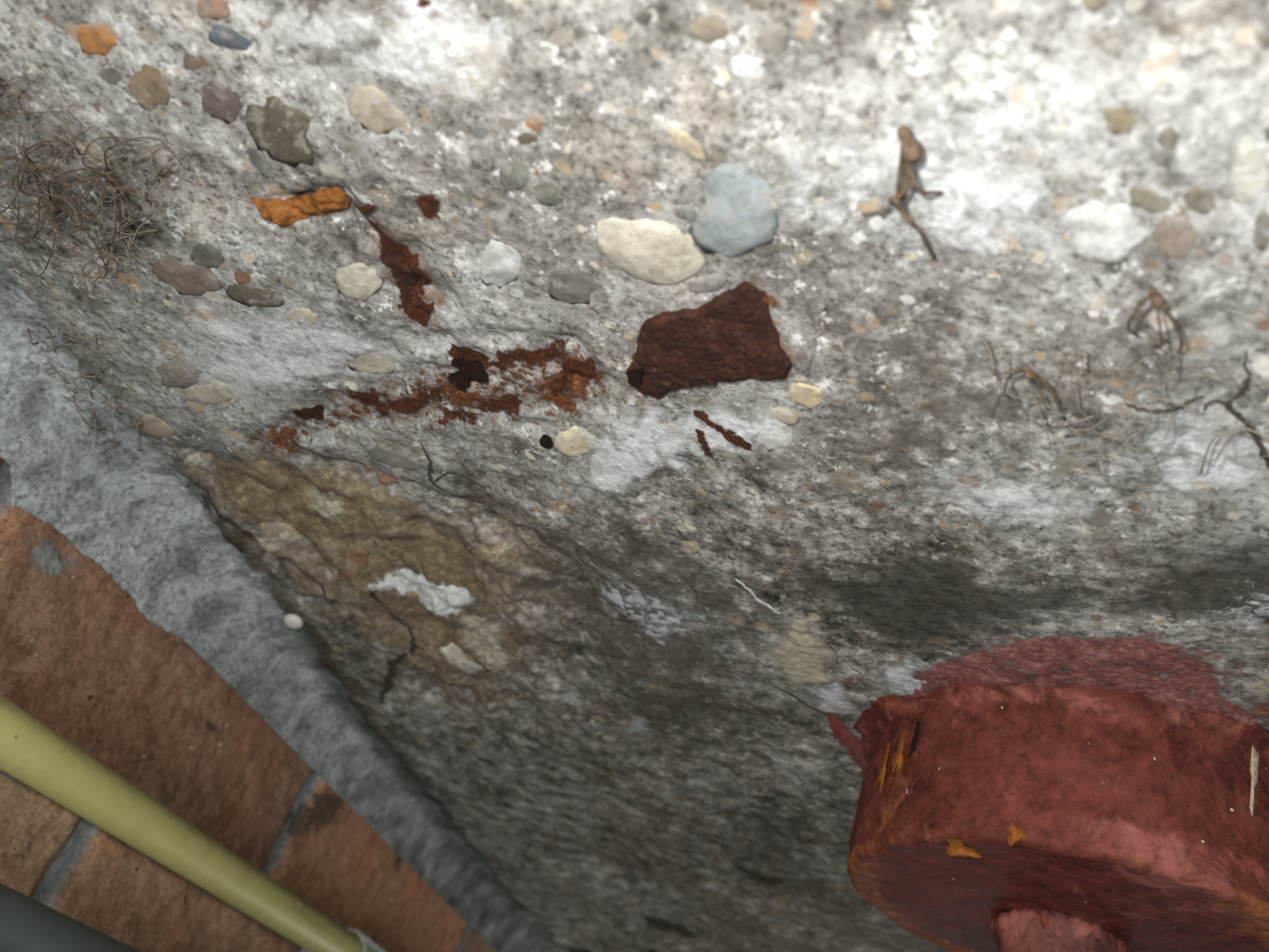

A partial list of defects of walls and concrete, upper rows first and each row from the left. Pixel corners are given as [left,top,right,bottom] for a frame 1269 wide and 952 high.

rust [348,194,441,326]
rust [248,281,796,459]
spalling [177,453,512,705]